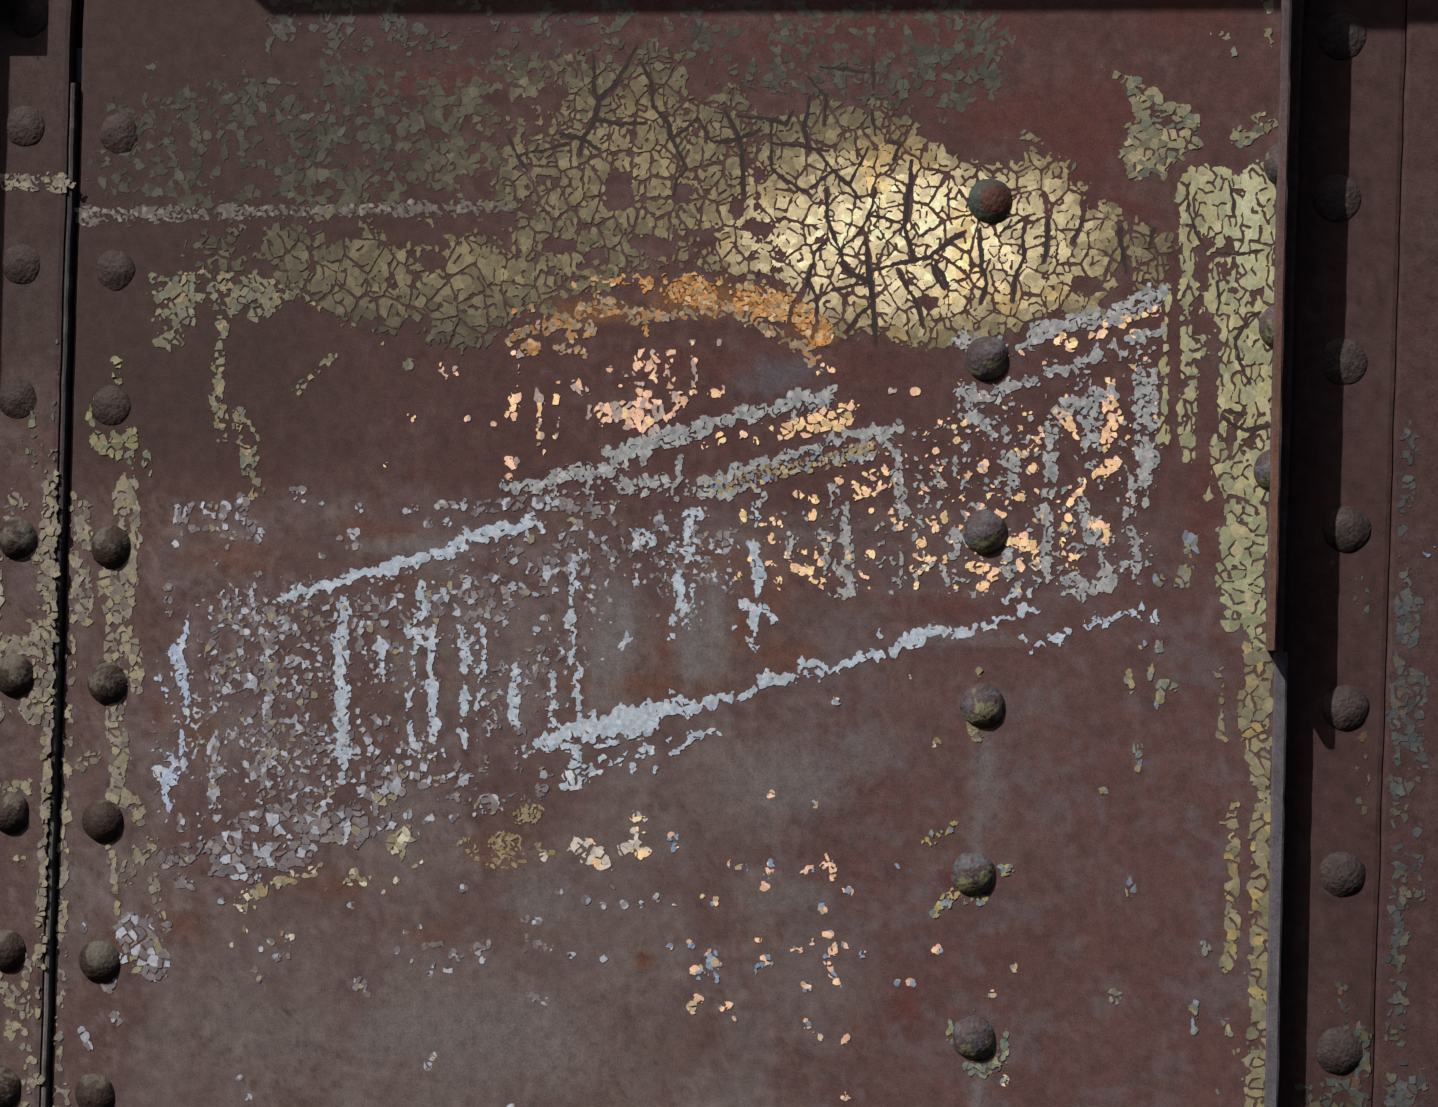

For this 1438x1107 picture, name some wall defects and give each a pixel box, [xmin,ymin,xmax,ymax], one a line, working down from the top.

peeling [1112,71,1204,181]
crack [506,44,1084,344]
crack [1117,227,1157,273]
crack [1187,181,1270,439]
corrosion [167,509,511,600]
corrosion [1176,403,1231,615]
corrosion [659,524,1075,710]
peeling [1019,601,1178,709]
peeling [0,398,152,1107]
corrosion [143,683,239,788]
peeling [567,810,652,870]
corrosion [277,863,479,962]